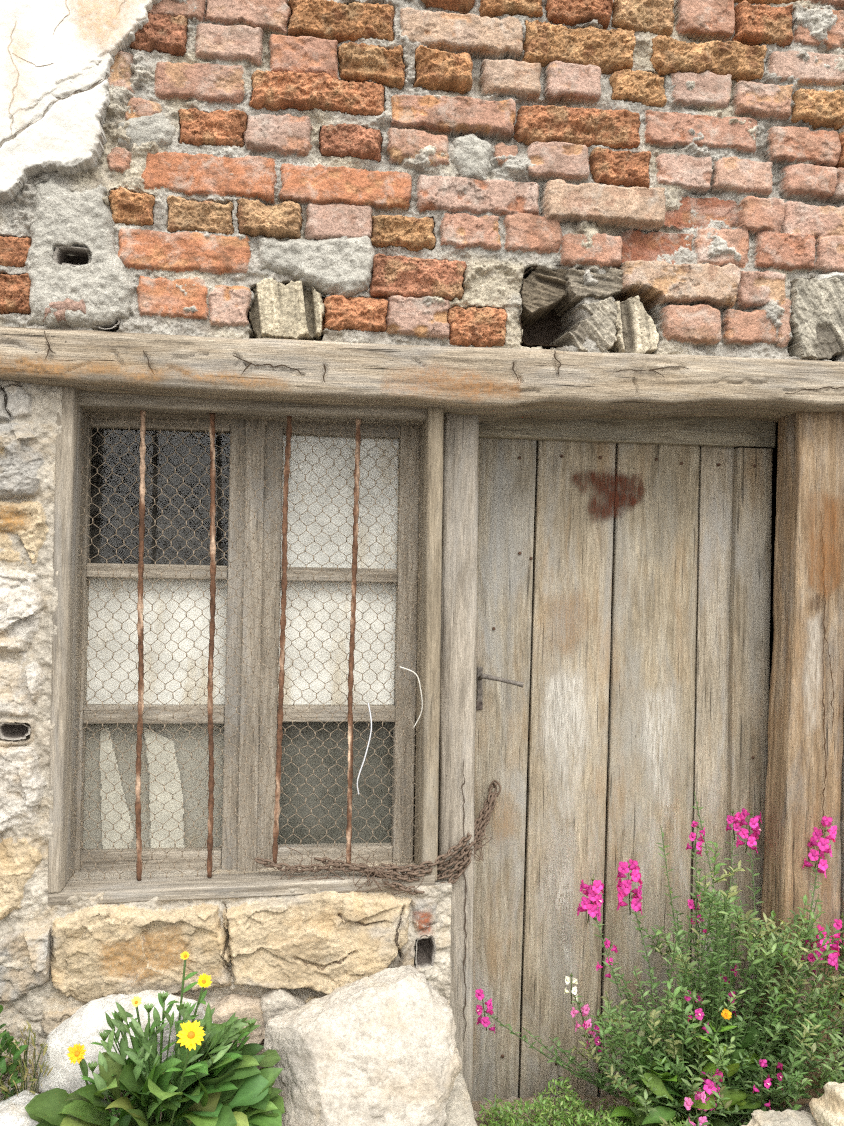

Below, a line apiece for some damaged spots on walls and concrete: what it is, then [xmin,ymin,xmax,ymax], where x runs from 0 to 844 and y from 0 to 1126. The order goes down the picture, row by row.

crack [0,22,109,146]
peeling [0,0,188,204]
corrosion [574,471,644,519]